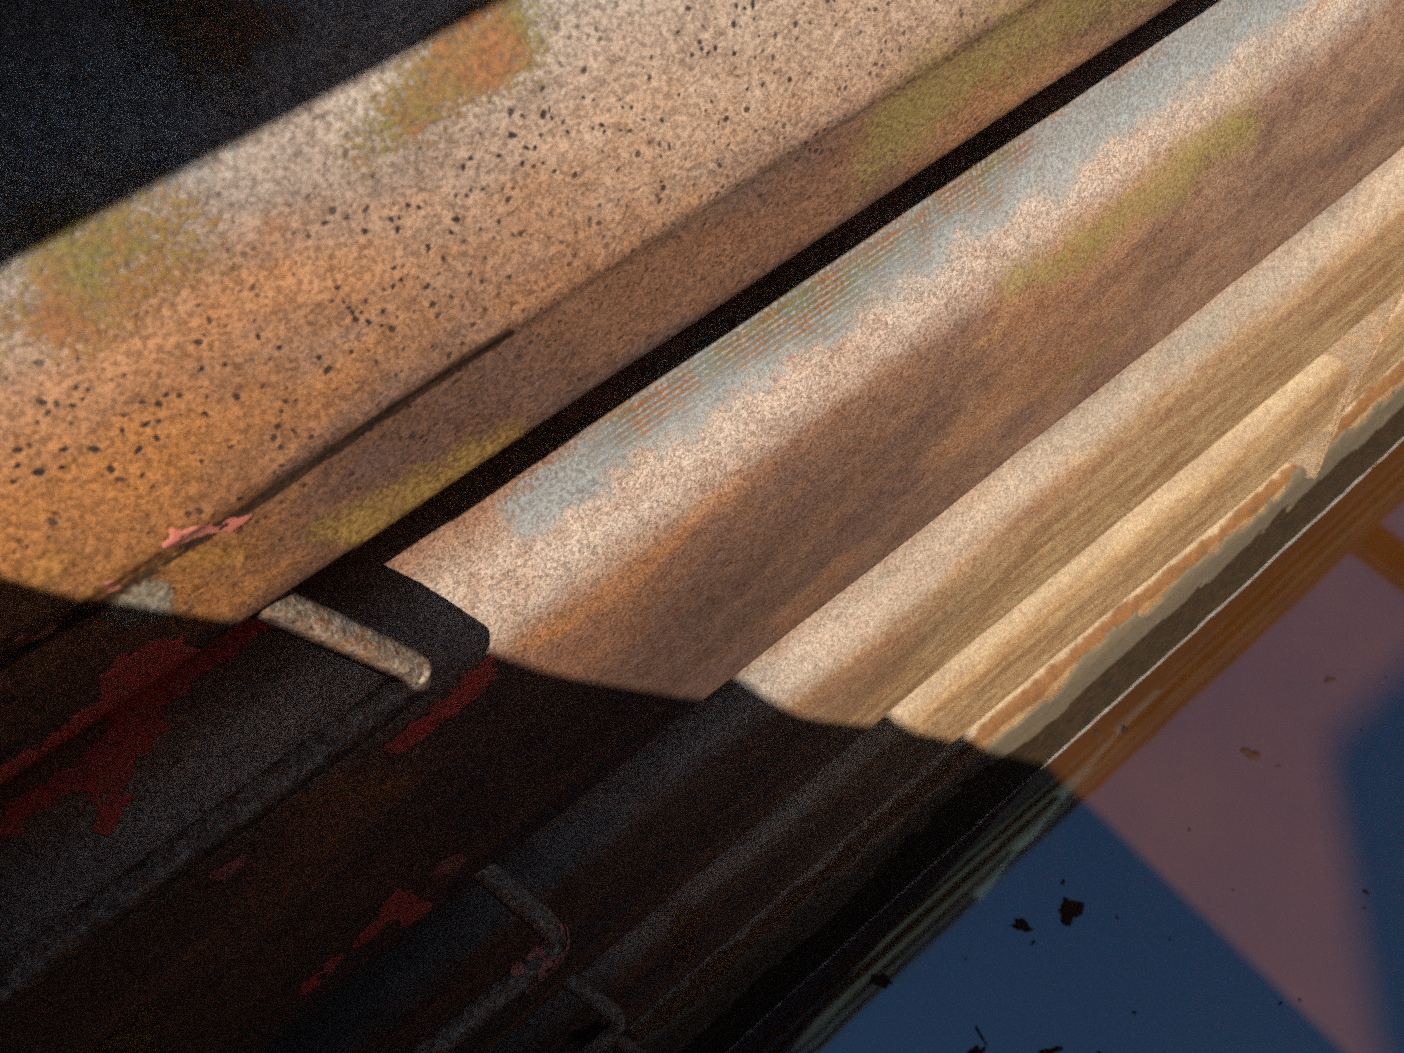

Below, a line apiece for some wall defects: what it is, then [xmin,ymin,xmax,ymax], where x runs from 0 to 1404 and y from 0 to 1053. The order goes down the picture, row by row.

corrosion [1328,361,1404,445]
corrosion [161,545,248,575]
peeling [162,514,253,548]
peeling [0,618,272,840]
peeling [383,655,498,755]
corrosion [612,464,1298,1053]
peeling [633,384,1404,1053]
peeling [297,889,436,996]
peeling [503,908,570,994]